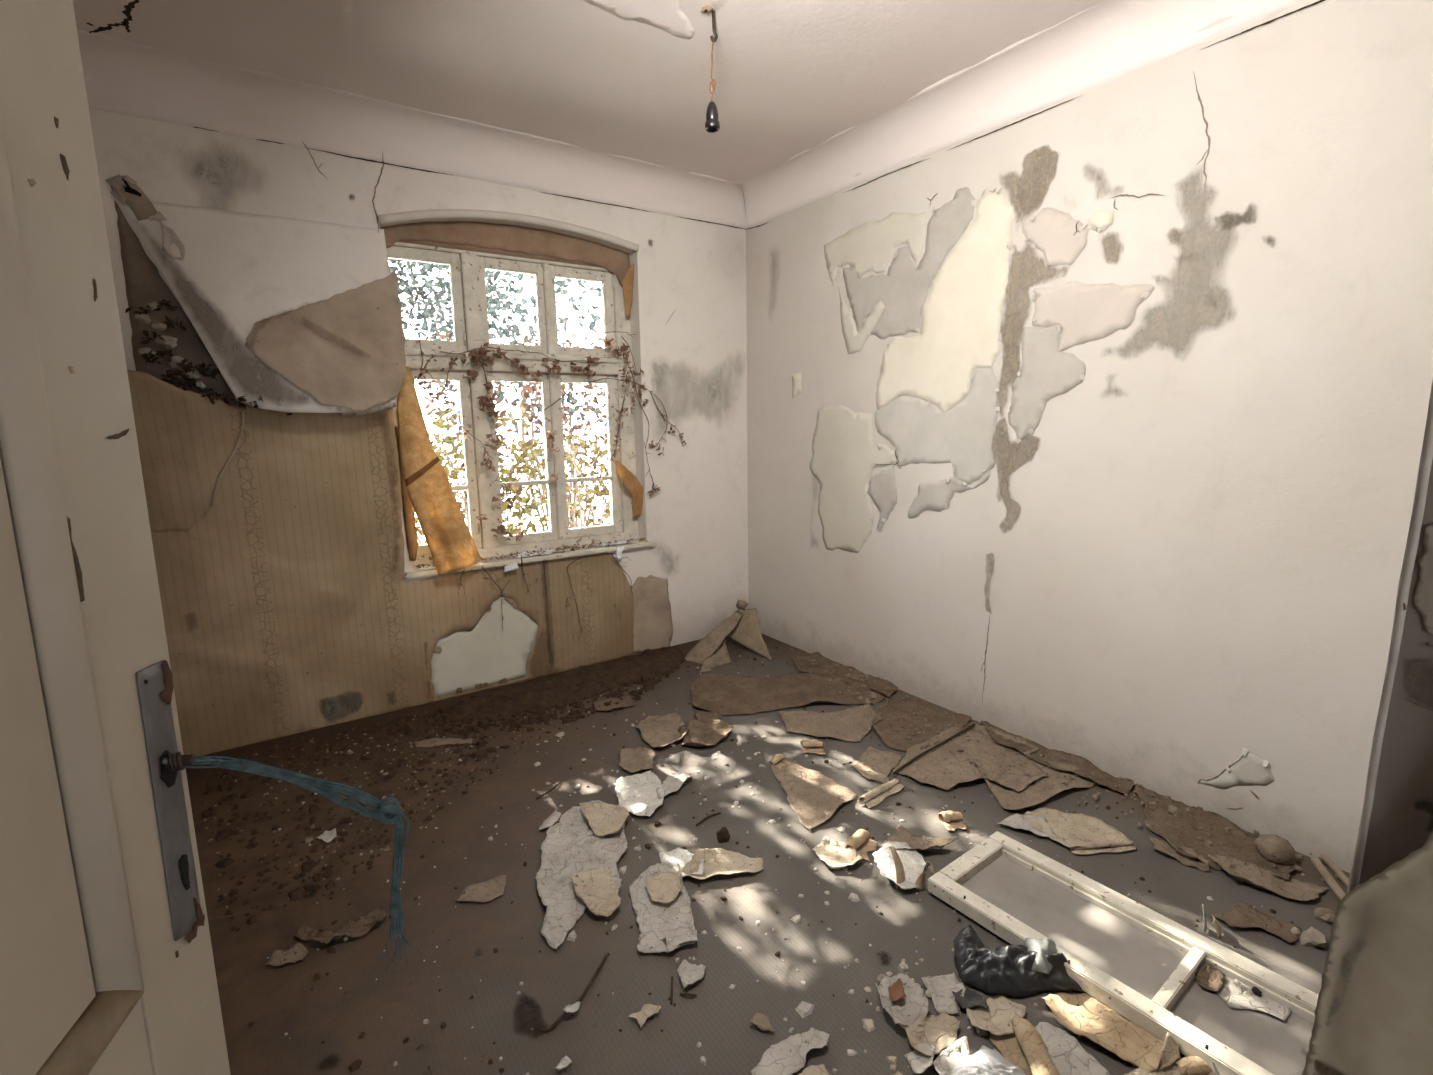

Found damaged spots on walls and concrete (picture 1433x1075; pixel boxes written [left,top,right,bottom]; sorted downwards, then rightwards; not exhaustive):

crack [86,0,139,33]
crack [1193,0,1325,186]
peeling [115,201,237,403]
peeling [810,187,1155,553]
peeling [431,597,538,697]
crack [981,615,990,702]
peeling [1403,524,1433,647]
peeling [1197,748,1274,789]